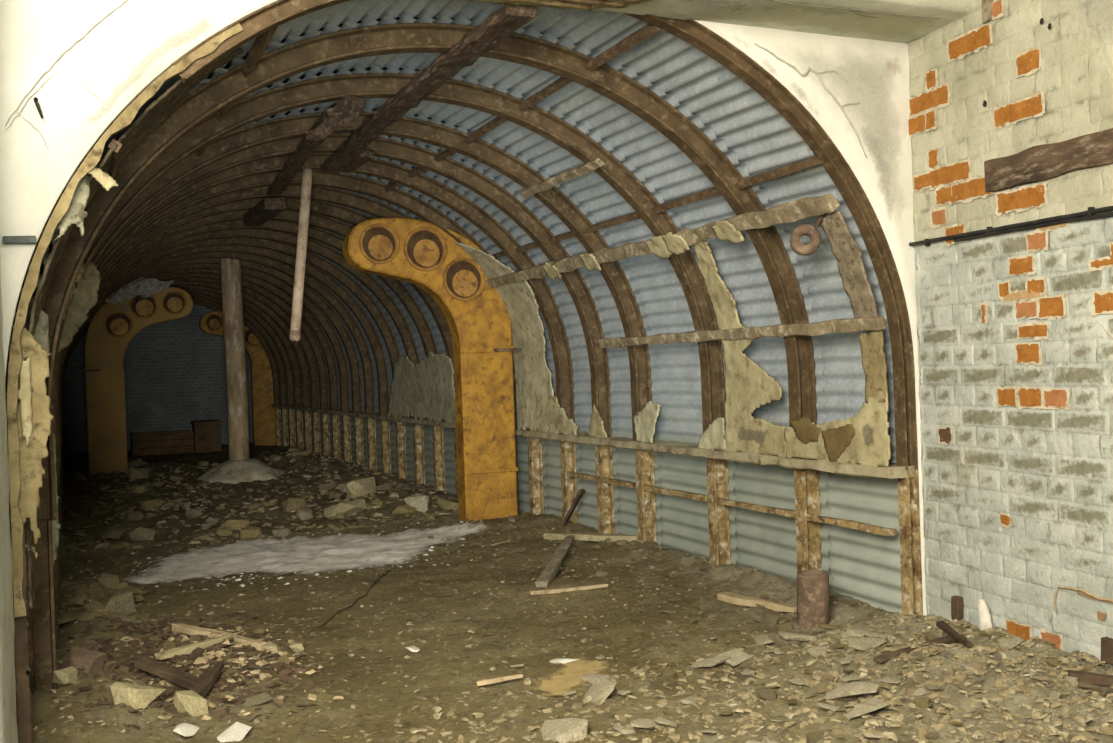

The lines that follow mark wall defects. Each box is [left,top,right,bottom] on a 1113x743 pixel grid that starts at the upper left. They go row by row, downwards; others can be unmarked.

peeling [947,0,1004,62]
peeling [1016,45,1042,78]
peeling [908,68,950,137]
peeling [983,92,1045,131]
peeling [88,167,119,191]
peeling [1088,243,1113,271]
peeling [1092,290,1113,317]
peeling [18,358,33,446]
peeling [996,386,1071,411]
peeling [633,401,661,443]
peeling [789,418,855,462]
peeling [1005,618,1064,651]